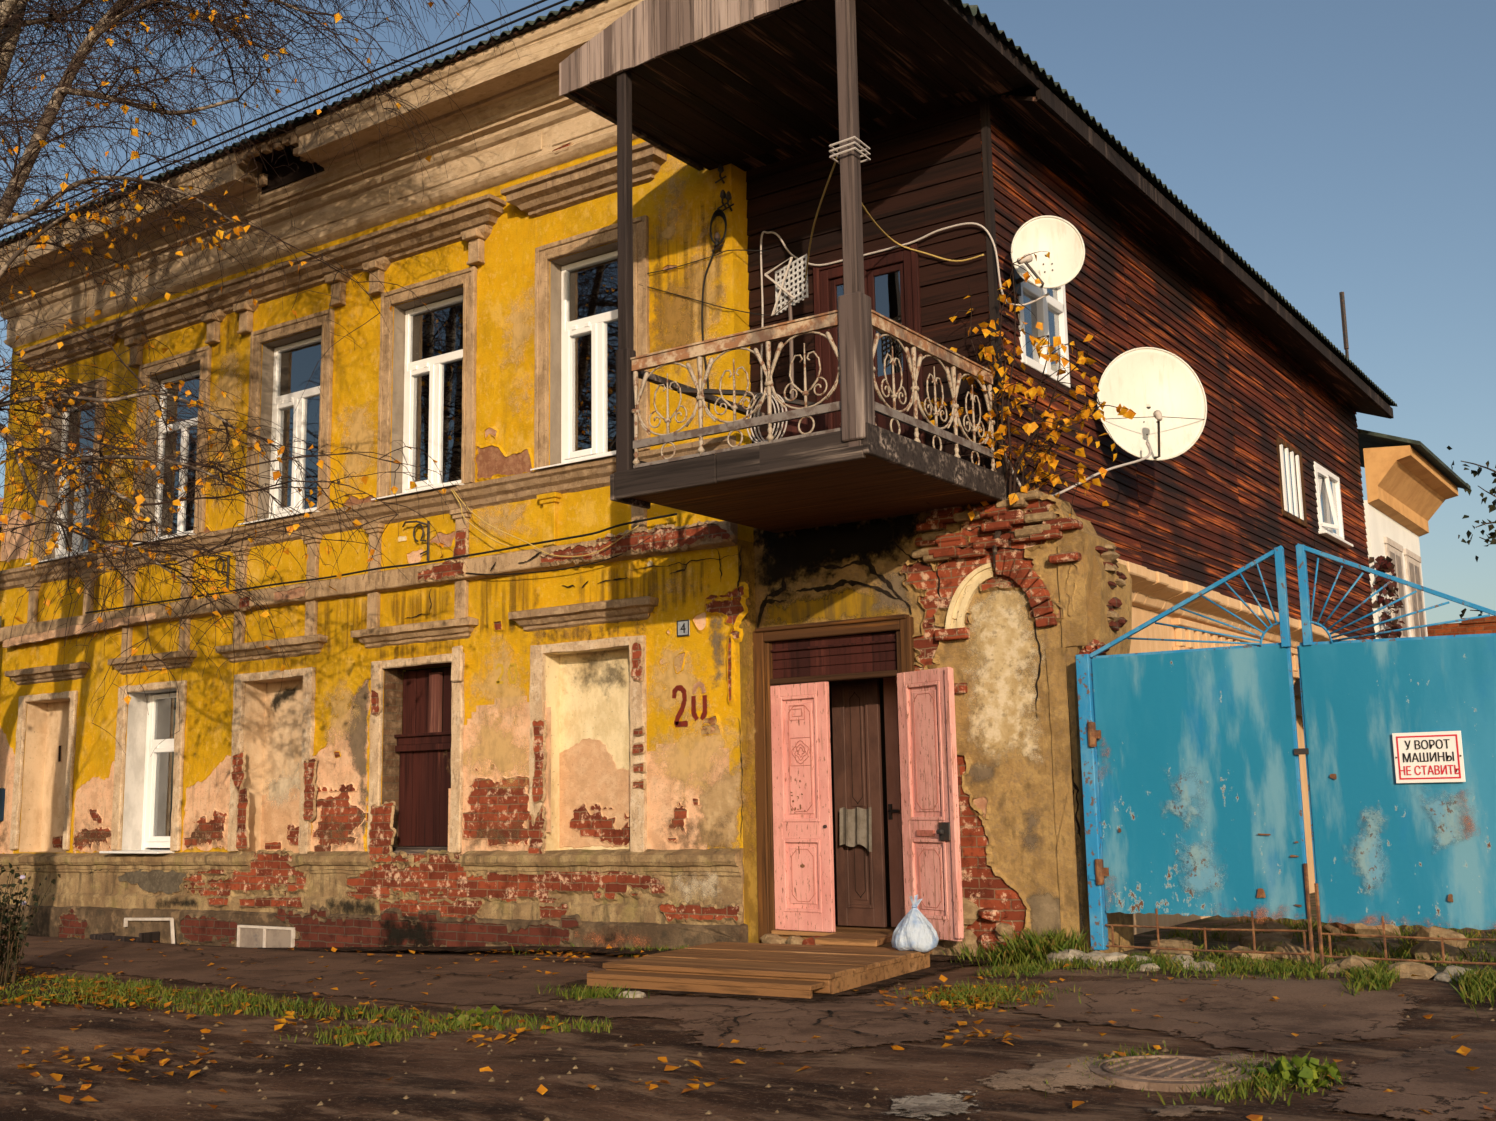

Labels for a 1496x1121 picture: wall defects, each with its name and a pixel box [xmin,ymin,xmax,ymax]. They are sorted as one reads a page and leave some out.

spalling [474,426,536,482]
crack [561,523,1042,628]
peeling [448,558,896,854]
crack [1034,622,1042,719]
peeling [260,678,371,853]
peeling [1166,772,1207,823]
peeling [1178,842,1222,893]